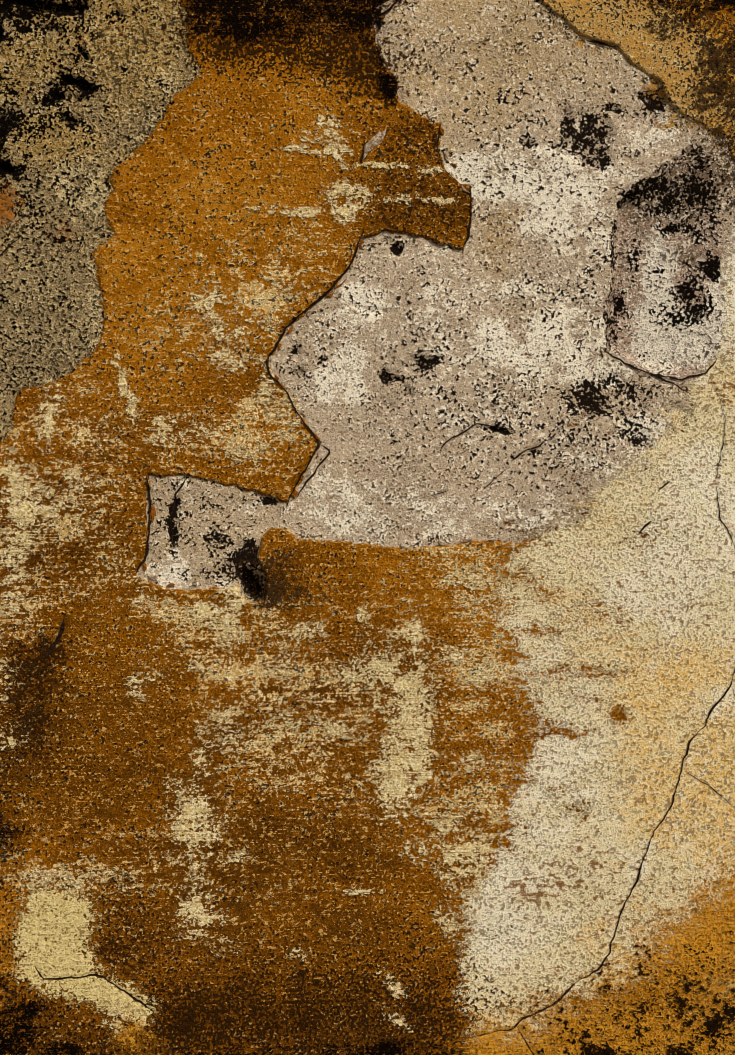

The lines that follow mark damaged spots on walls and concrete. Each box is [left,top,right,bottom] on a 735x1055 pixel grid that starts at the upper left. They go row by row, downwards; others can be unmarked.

damp [638,0,735,22]
rust [0,177,24,227]
damp [153,0,477,247]
peeling [243,108,459,232]
crack [603,349,735,547]
peeling [321,597,469,826]
peeling [159,701,256,956]
crack [455,671,735,1055]
crack [35,966,151,1010]
rust [111,1012,163,1052]
damp [0,881,735,1055]
rust [445,869,735,1055]